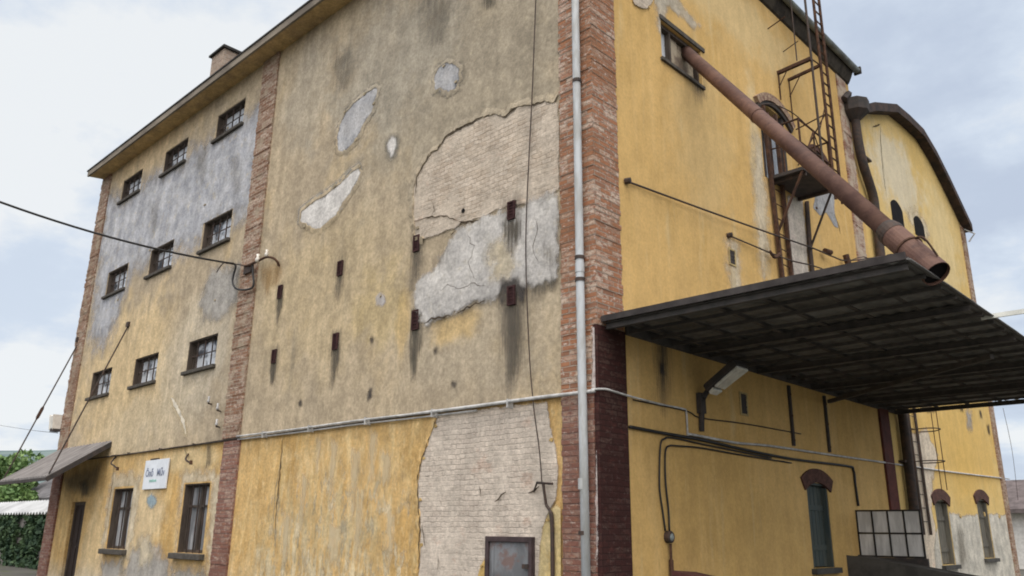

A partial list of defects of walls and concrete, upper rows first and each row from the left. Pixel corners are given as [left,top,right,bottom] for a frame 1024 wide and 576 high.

flaking render [633,0,653,9]
peeling [430,57,464,99]
peeling [298,83,381,235]
peeling [386,135,398,159]
flaking render [408,91,559,245]
crack [424,234,489,324]
water stain [410,309,420,372]
crack [273,439,283,534]
flaking render [413,402,558,576]
peeling [912,429,1015,576]